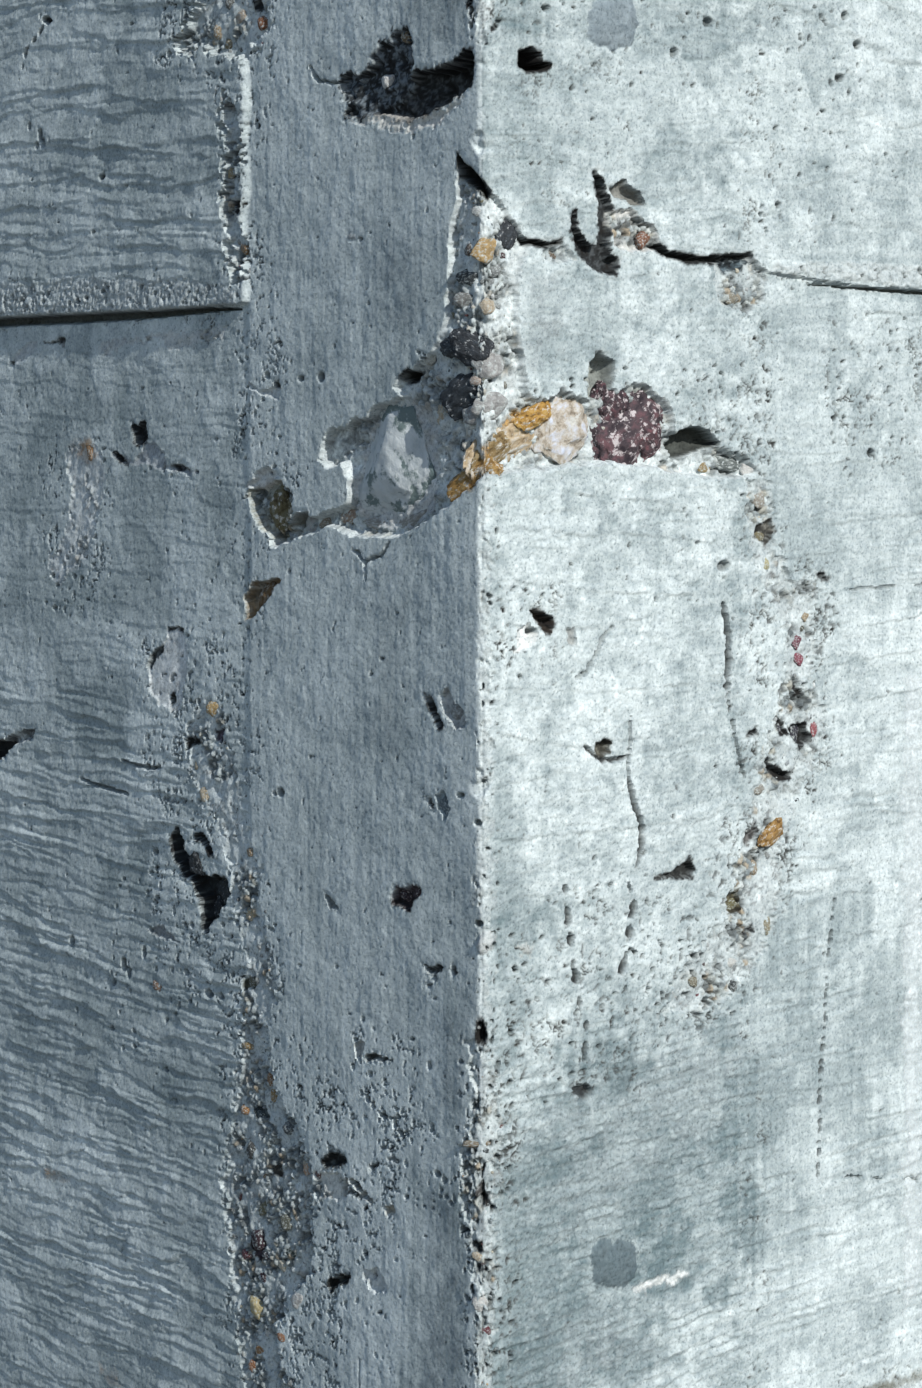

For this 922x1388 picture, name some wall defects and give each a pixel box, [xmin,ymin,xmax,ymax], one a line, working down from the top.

spalling [338,25,475,135]
spalling [245,153,768,549]
peeling [194,832,213,856]